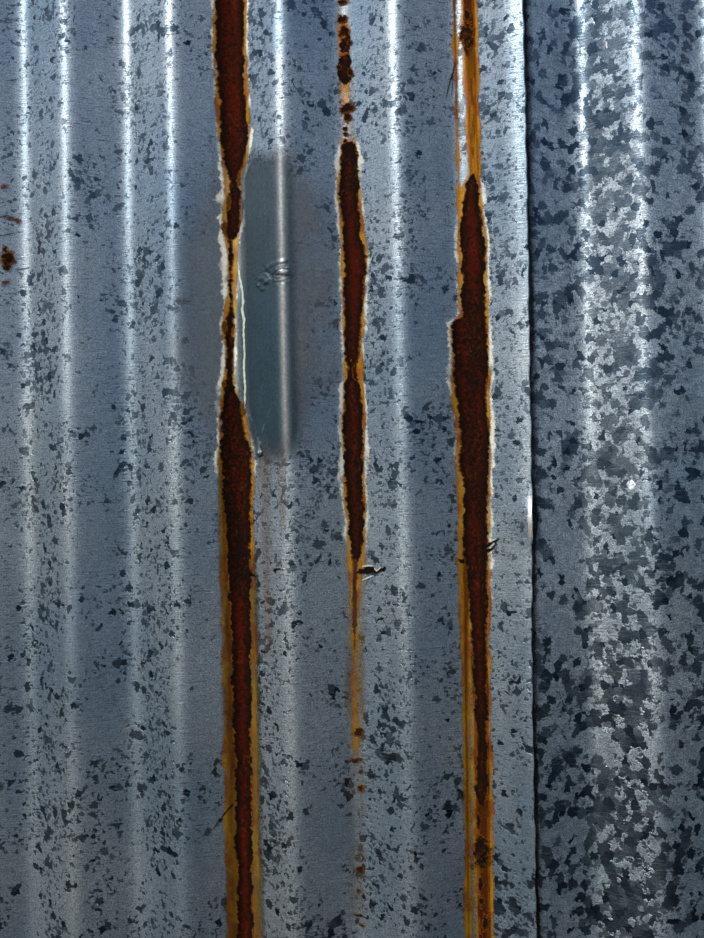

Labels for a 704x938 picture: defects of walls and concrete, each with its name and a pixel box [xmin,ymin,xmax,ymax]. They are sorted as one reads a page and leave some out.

corrosion [0,245,16,270]
corrosion [211,0,264,938]
corrosion [334,0,370,774]
corrosion [446,0,499,938]